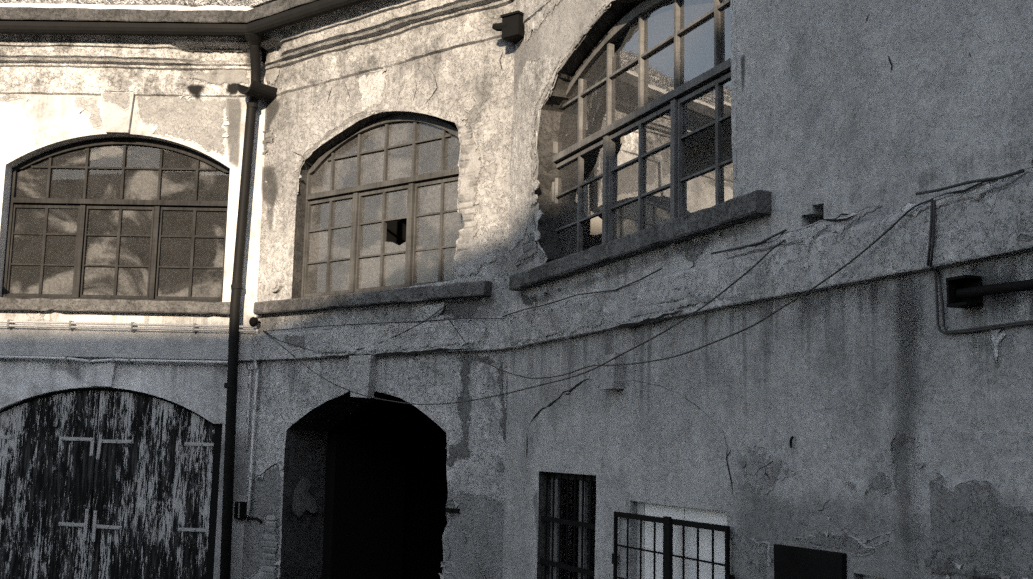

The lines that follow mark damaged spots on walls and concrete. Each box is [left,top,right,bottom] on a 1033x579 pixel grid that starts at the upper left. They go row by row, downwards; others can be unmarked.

flaking render [452,0,611,278]
flaking render [901,165,1033,217]
flaking render [671,230,722,269]
flaking render [725,204,883,259]
flaking render [284,284,740,469]
flaking render [990,329,1007,368]
crack [506,379,591,455]
flaking render [738,445,796,496]
flaking render [241,460,318,579]
flaking render [439,490,505,579]
flaking render [924,472,1033,579]